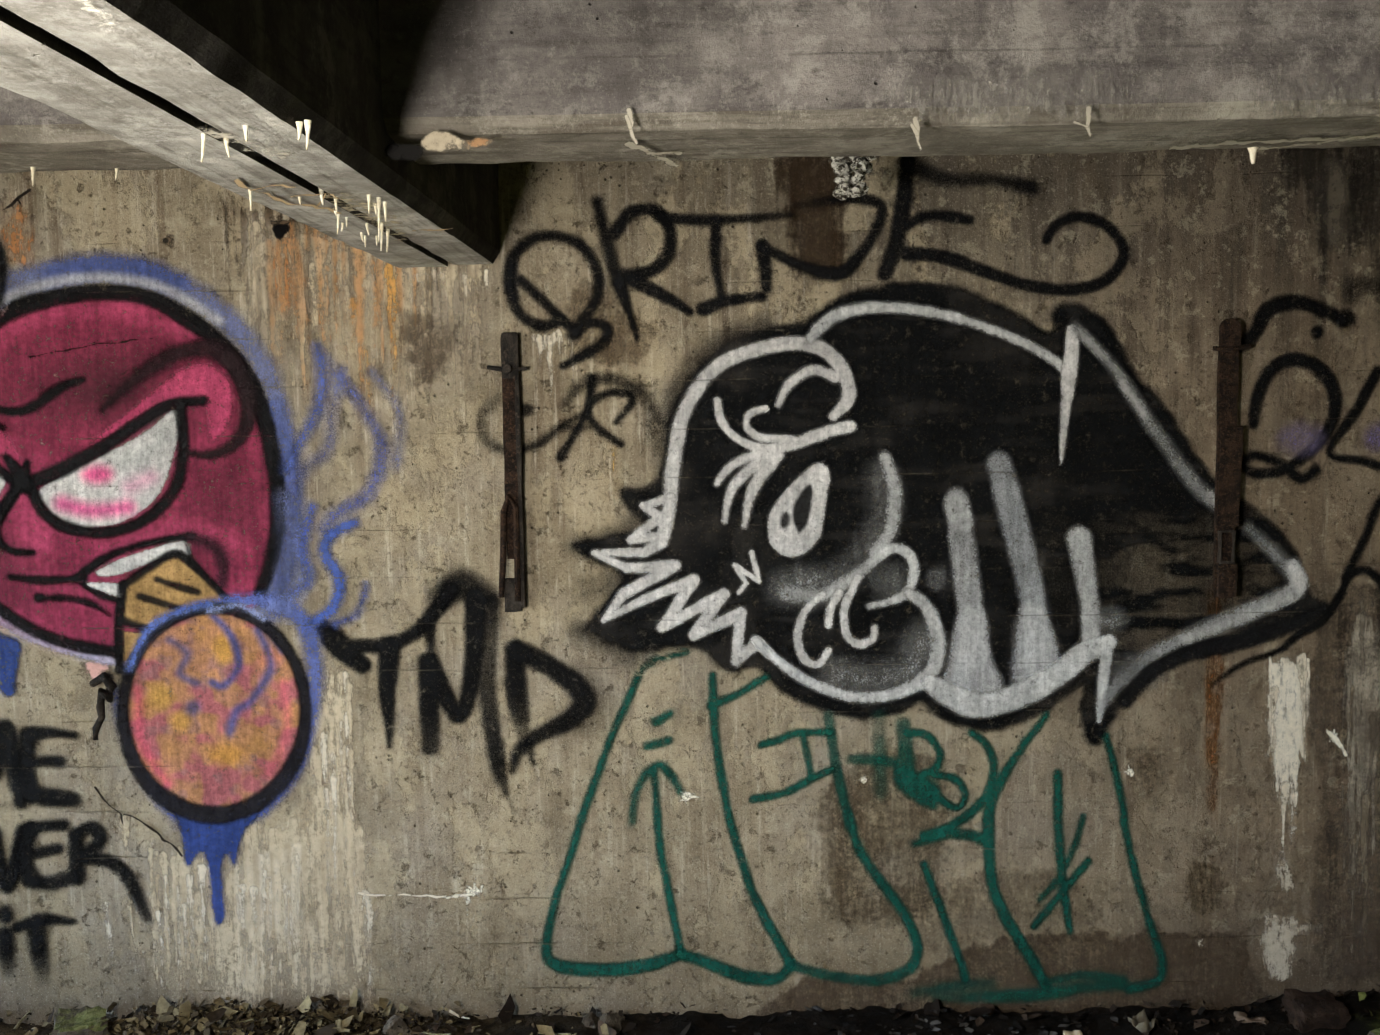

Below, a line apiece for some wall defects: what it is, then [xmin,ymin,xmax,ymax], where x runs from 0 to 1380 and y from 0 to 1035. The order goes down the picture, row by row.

crack [3,189,31,210]
crack [234,179,341,214]
crack [1169,133,1380,150]
leakage [1280,137,1380,263]
rust [1205,632,1224,808]
leakage [757,585,1380,1016]